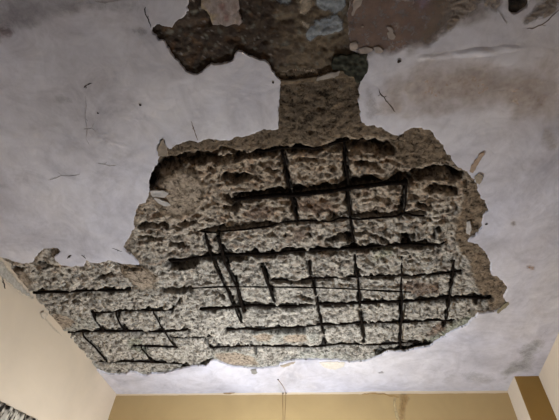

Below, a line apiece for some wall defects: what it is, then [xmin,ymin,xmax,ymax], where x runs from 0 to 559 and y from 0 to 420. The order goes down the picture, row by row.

flaking render [152,0,368,91]
flaking render [446,0,500,31]
flaking render [524,0,558,24]
spalling [2,78,509,374]